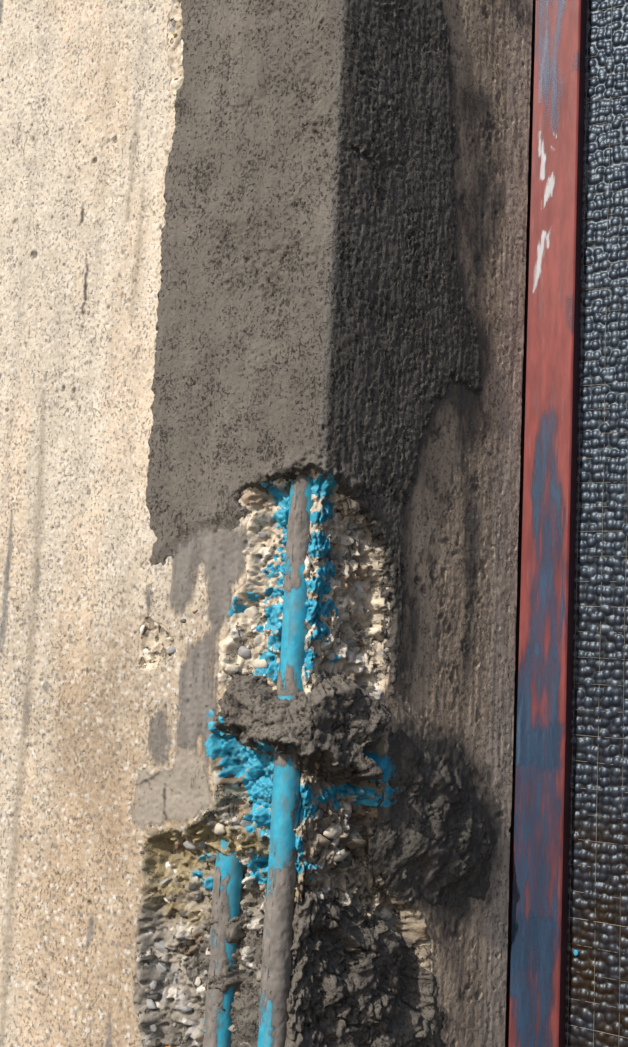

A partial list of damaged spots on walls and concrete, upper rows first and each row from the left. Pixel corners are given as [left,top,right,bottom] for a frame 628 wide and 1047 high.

spalling [137,617,176,672]
spalling [217,469,391,703]
spalling [133,709,275,1047]
spalling [293,728,431,971]